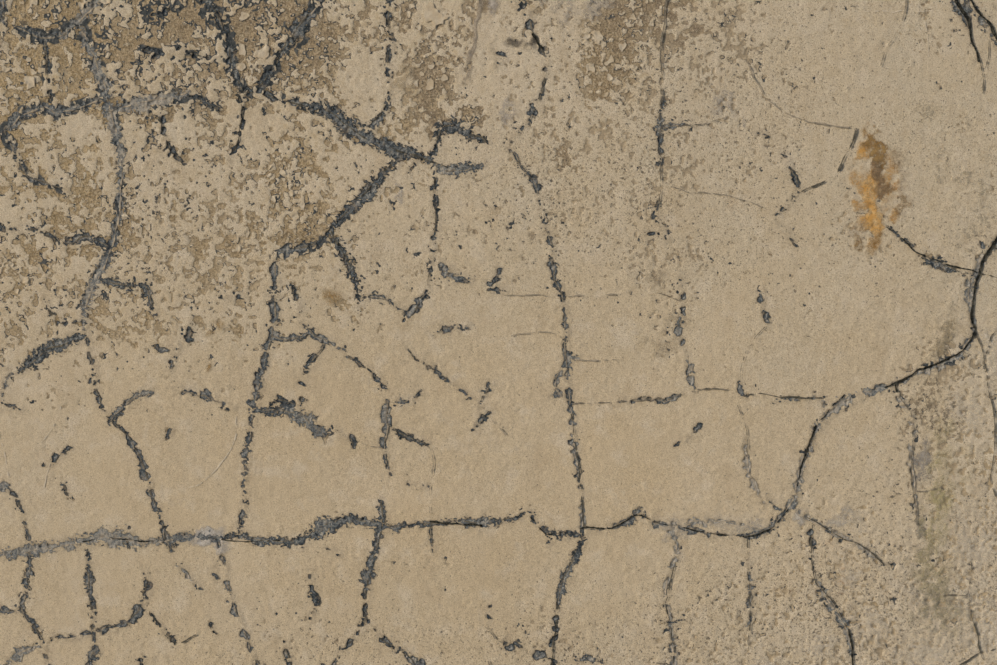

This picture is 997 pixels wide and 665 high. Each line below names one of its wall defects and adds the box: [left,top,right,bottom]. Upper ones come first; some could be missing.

crack [0,0,744,665]
peeling [480,336,997,665]
crack [647,0,857,247]
peeling [803,183,908,268]
crack [736,226,997,665]
corrosion [852,135,897,250]
peeling [899,0,983,60]
crack [951,0,997,93]